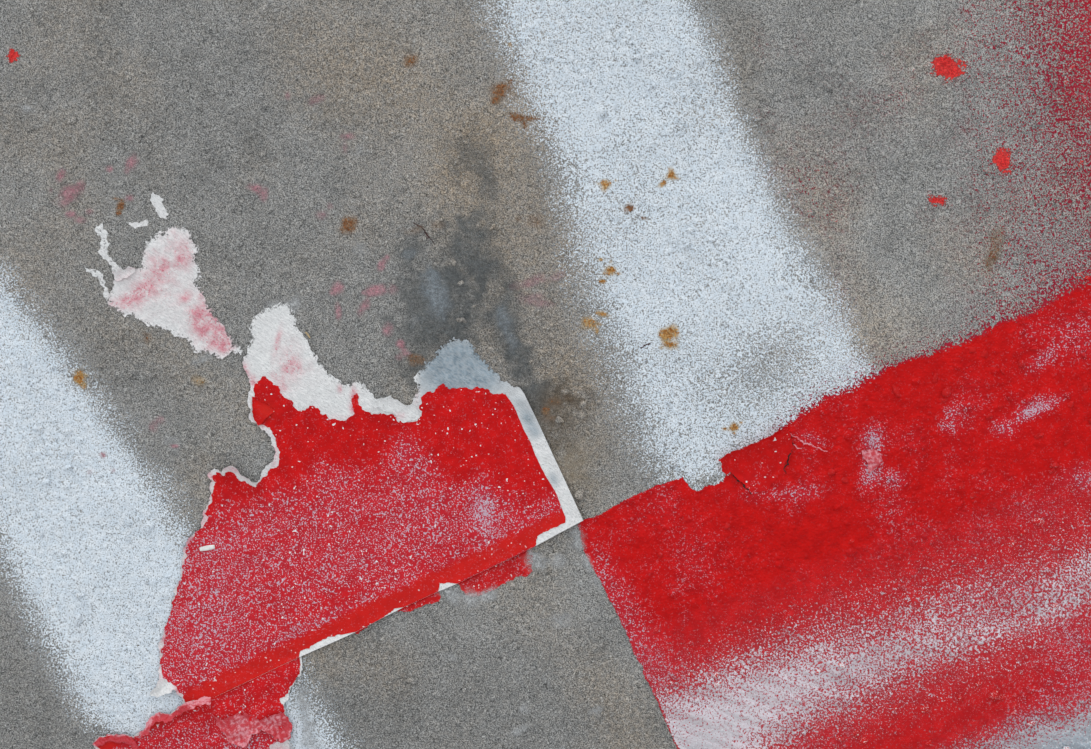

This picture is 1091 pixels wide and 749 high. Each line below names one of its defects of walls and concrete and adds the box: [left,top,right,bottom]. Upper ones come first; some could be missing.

peeling [129,192,169,229]
peeling [458,548,533,596]
peeling [397,591,441,612]